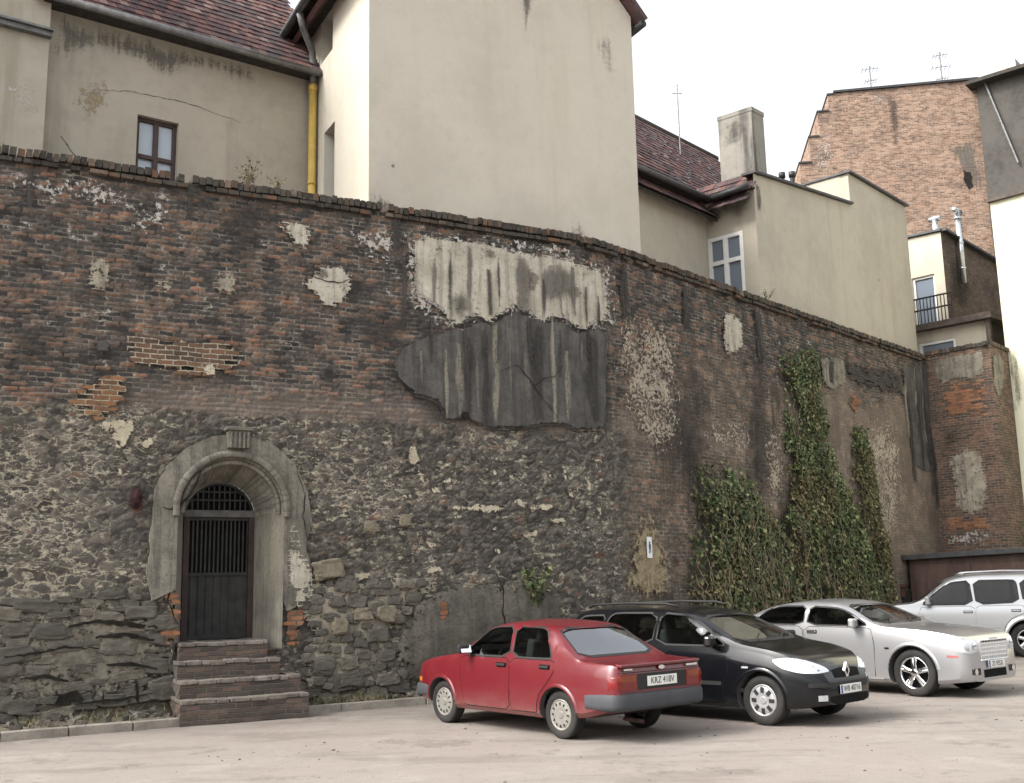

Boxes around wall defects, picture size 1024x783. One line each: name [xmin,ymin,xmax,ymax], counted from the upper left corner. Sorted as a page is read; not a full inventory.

leakage [63,22,250,77]
crack [94,89,241,123]
peeling [403,232,619,334]
crack [389,365,602,433]
spalling [399,514,412,527]
spalling [283,573,441,699]